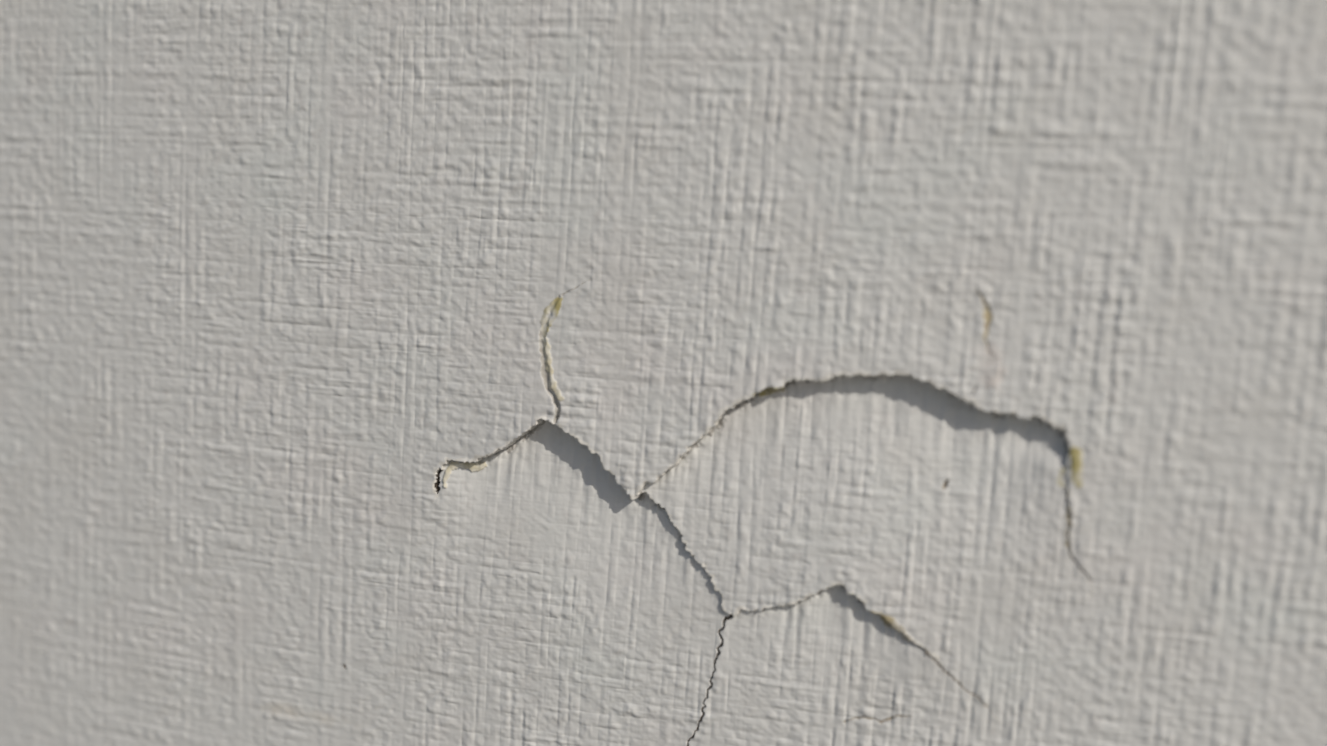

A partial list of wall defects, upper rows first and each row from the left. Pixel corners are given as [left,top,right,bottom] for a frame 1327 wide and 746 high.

crack [539,279,592,424]
peeling [432,370,1095,725]
crack [687,614,733,746]
crack [844,715,914,723]